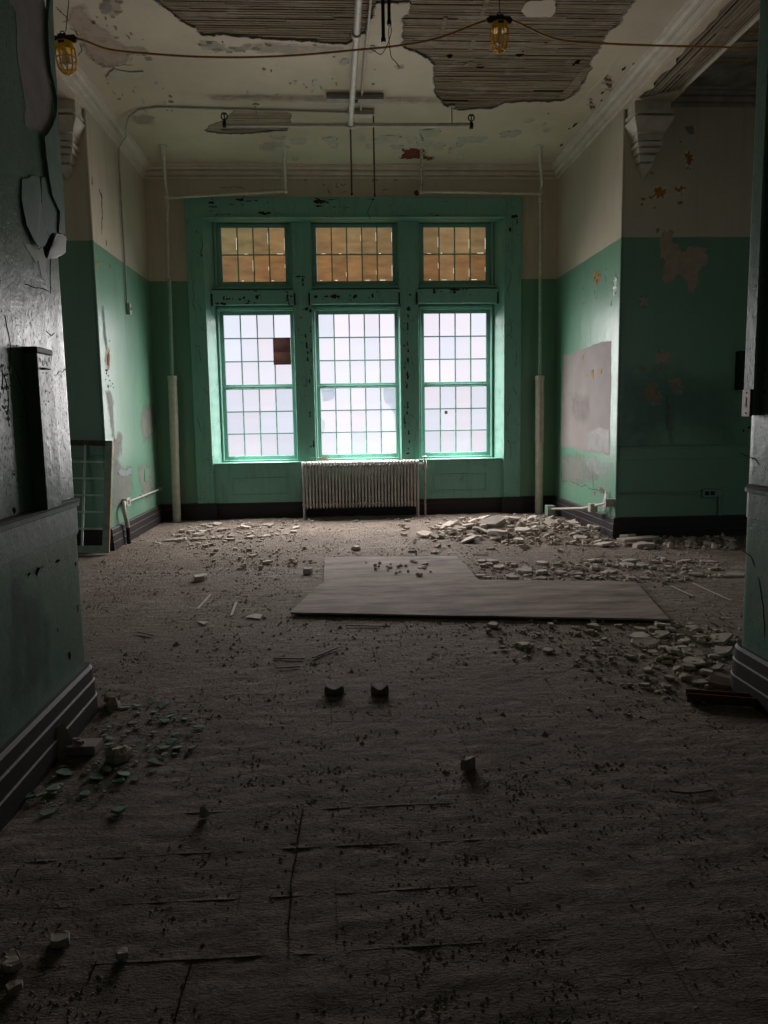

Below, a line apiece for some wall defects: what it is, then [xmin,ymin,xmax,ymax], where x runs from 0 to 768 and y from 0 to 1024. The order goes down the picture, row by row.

peeling [69,0,152,119]
flaking render [154,0,636,114]
flaking render [625,0,731,110]
spalling [8,0,66,279]
peeling [656,228,709,295]
flaking render [560,341,611,456]